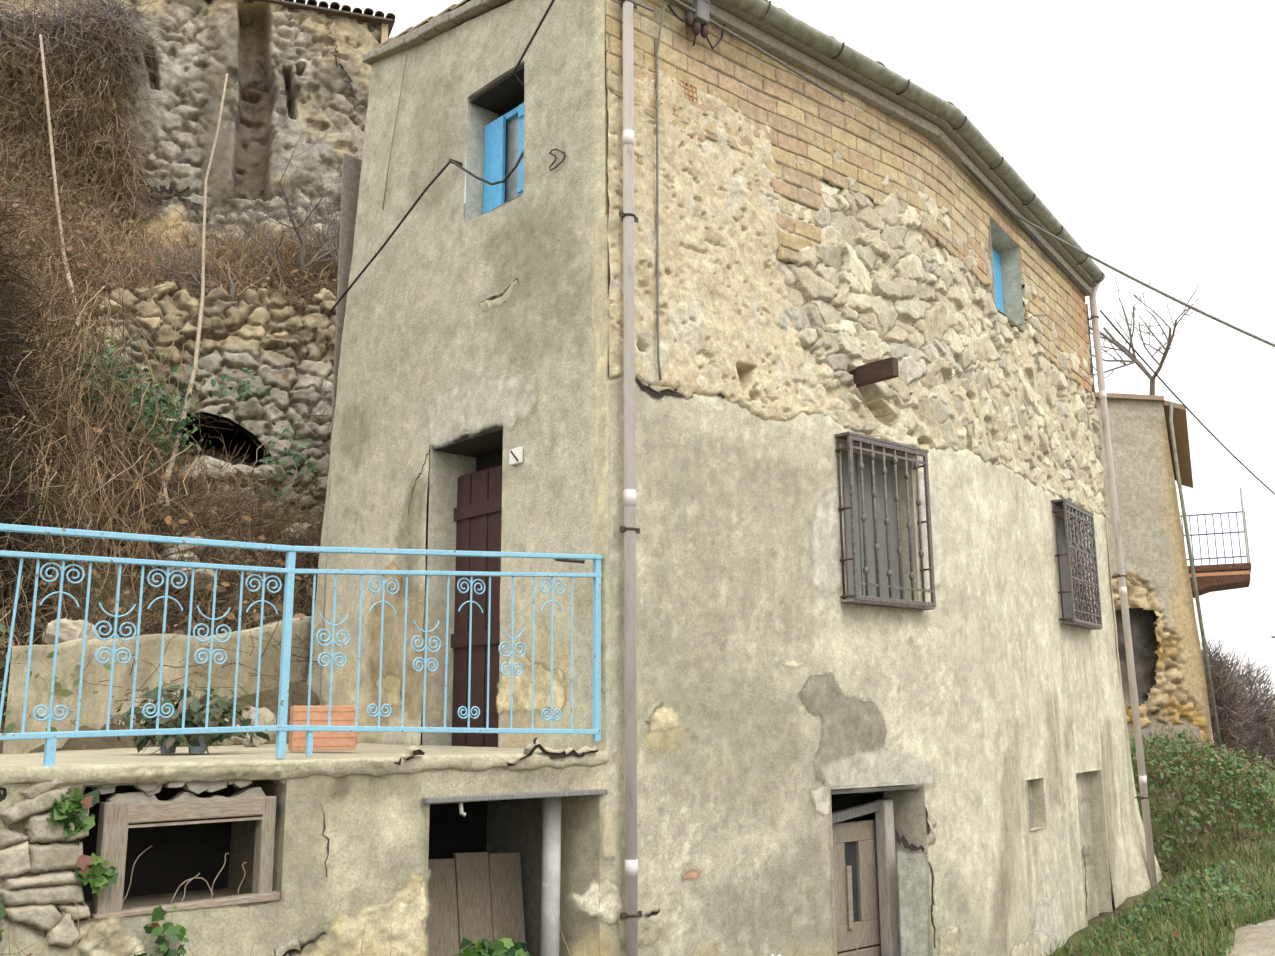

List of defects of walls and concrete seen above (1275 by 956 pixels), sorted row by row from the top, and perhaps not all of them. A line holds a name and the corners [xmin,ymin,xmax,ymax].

spalling [650,705,679,730]
flaking render [0,765,285,956]
flaking render [296,874,429,956]
crack [926,853,937,947]